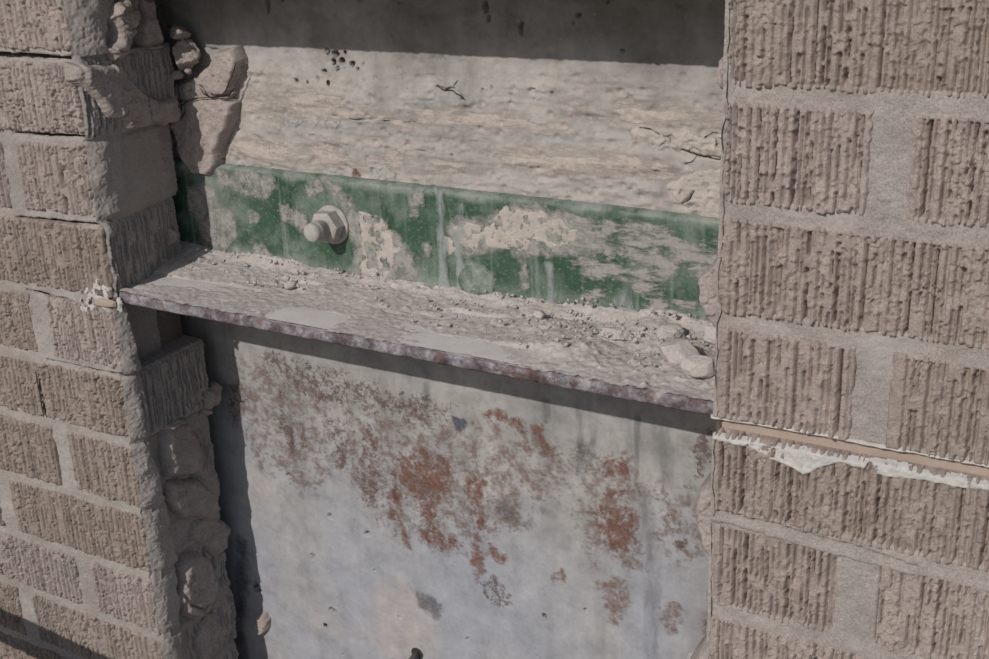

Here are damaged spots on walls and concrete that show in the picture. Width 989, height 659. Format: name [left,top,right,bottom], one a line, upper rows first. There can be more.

crack [0,52,87,60]
peeling [187,169,275,252]
peeling [279,204,308,230]
peeling [306,178,419,282]
peeling [409,191,424,217]
peeling [444,203,718,322]
crack [35,371,44,417]
corrosion [228,351,555,606]
corrosion [586,460,638,567]